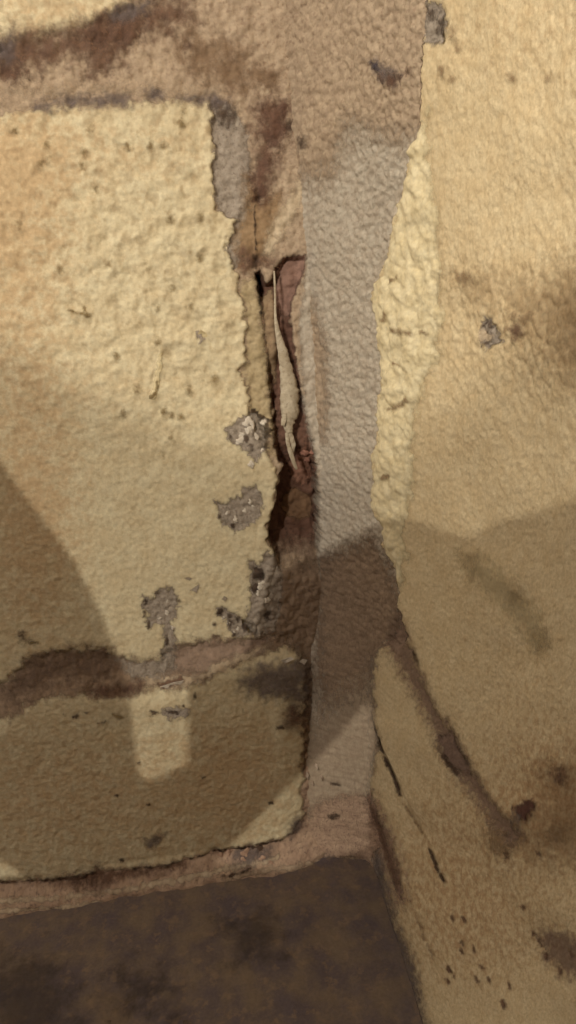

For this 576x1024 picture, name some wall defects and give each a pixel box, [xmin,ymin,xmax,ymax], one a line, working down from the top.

water stain [0,1,196,80]
water stain [370,61,406,85]
flaking render [0,0,324,760]
flaking render [281,0,524,873]
water stain [240,660,310,728]
spalling [0,779,325,919]
crack [365,729,445,957]